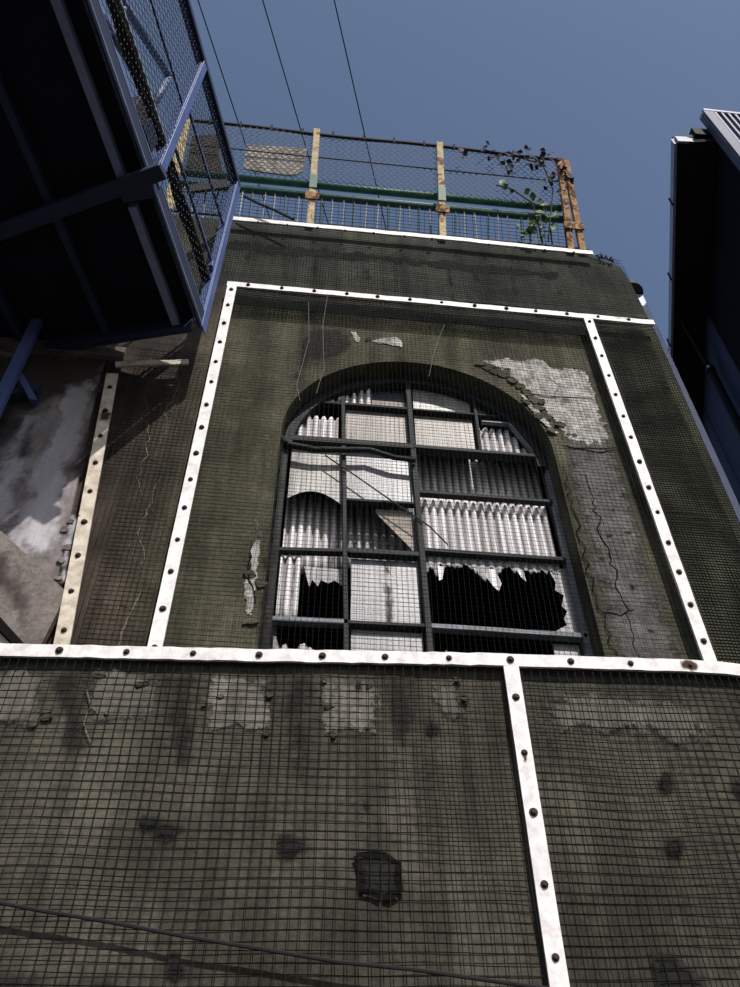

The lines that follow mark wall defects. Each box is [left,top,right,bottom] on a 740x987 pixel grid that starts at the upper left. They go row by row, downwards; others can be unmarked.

spalling [351,332,402,347]
damp [0,354,106,552]
peeling [474,358,677,659]
peeling [242,522,268,626]
spalling [546,692,718,746]
spalling [353,851,404,900]